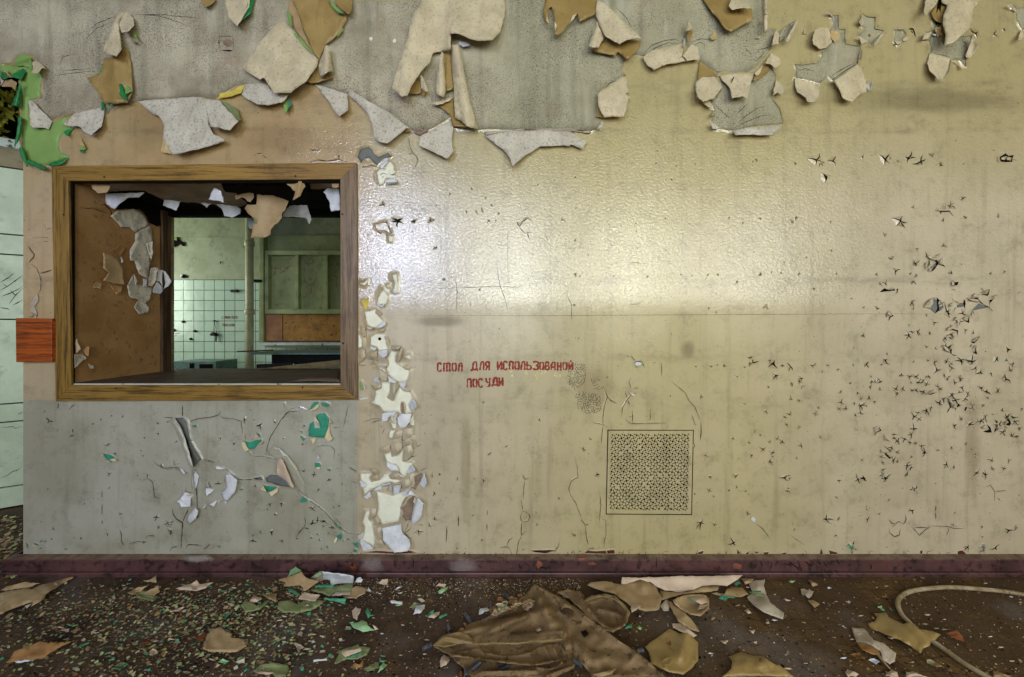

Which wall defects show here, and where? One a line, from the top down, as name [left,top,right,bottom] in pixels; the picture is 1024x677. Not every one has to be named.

peeling [0,0,979,188]
peeling [81,181,340,314]
peeling [372,219,396,244]
peeling [74,340,94,369]
crack [25,402,359,552]
peeling [175,464,246,526]
peeling [320,270,434,554]
peeling [531,547,668,569]
crack [413,196,1024,571]